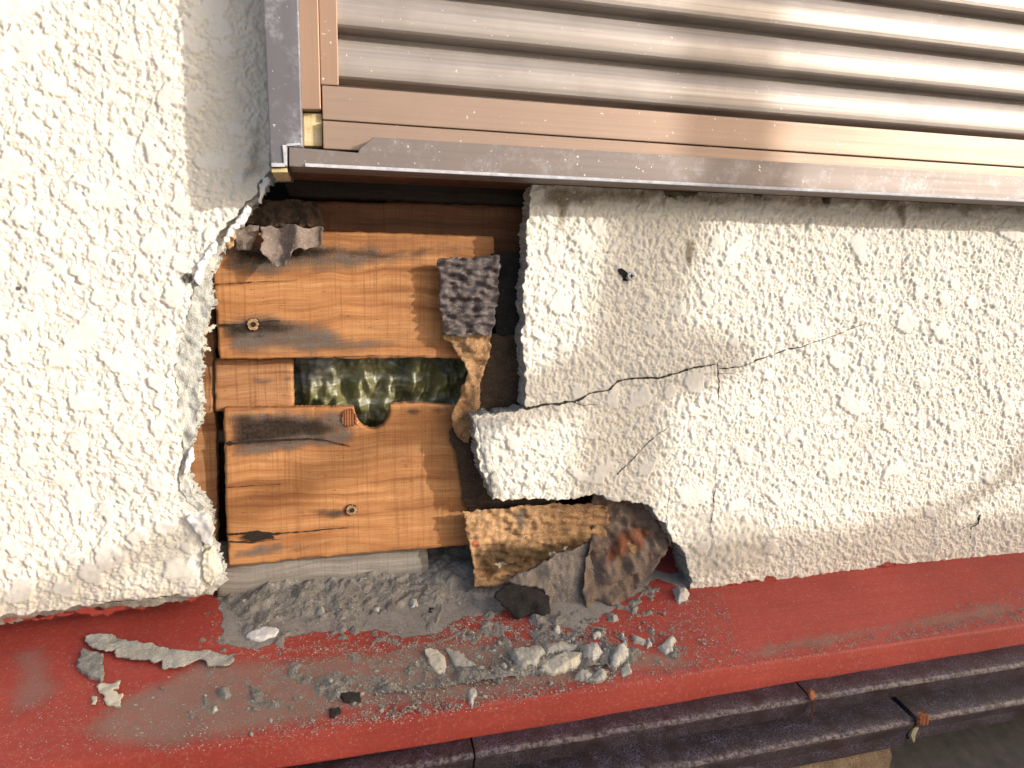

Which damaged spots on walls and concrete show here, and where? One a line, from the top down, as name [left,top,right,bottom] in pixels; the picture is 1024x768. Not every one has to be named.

spalling [175,177,271,586]
crack [526,324,864,410]
spalling [473,413,510,497]
peeling [217,597,507,649]
peeling [528,569,689,629]
rust [908,711,931,743]